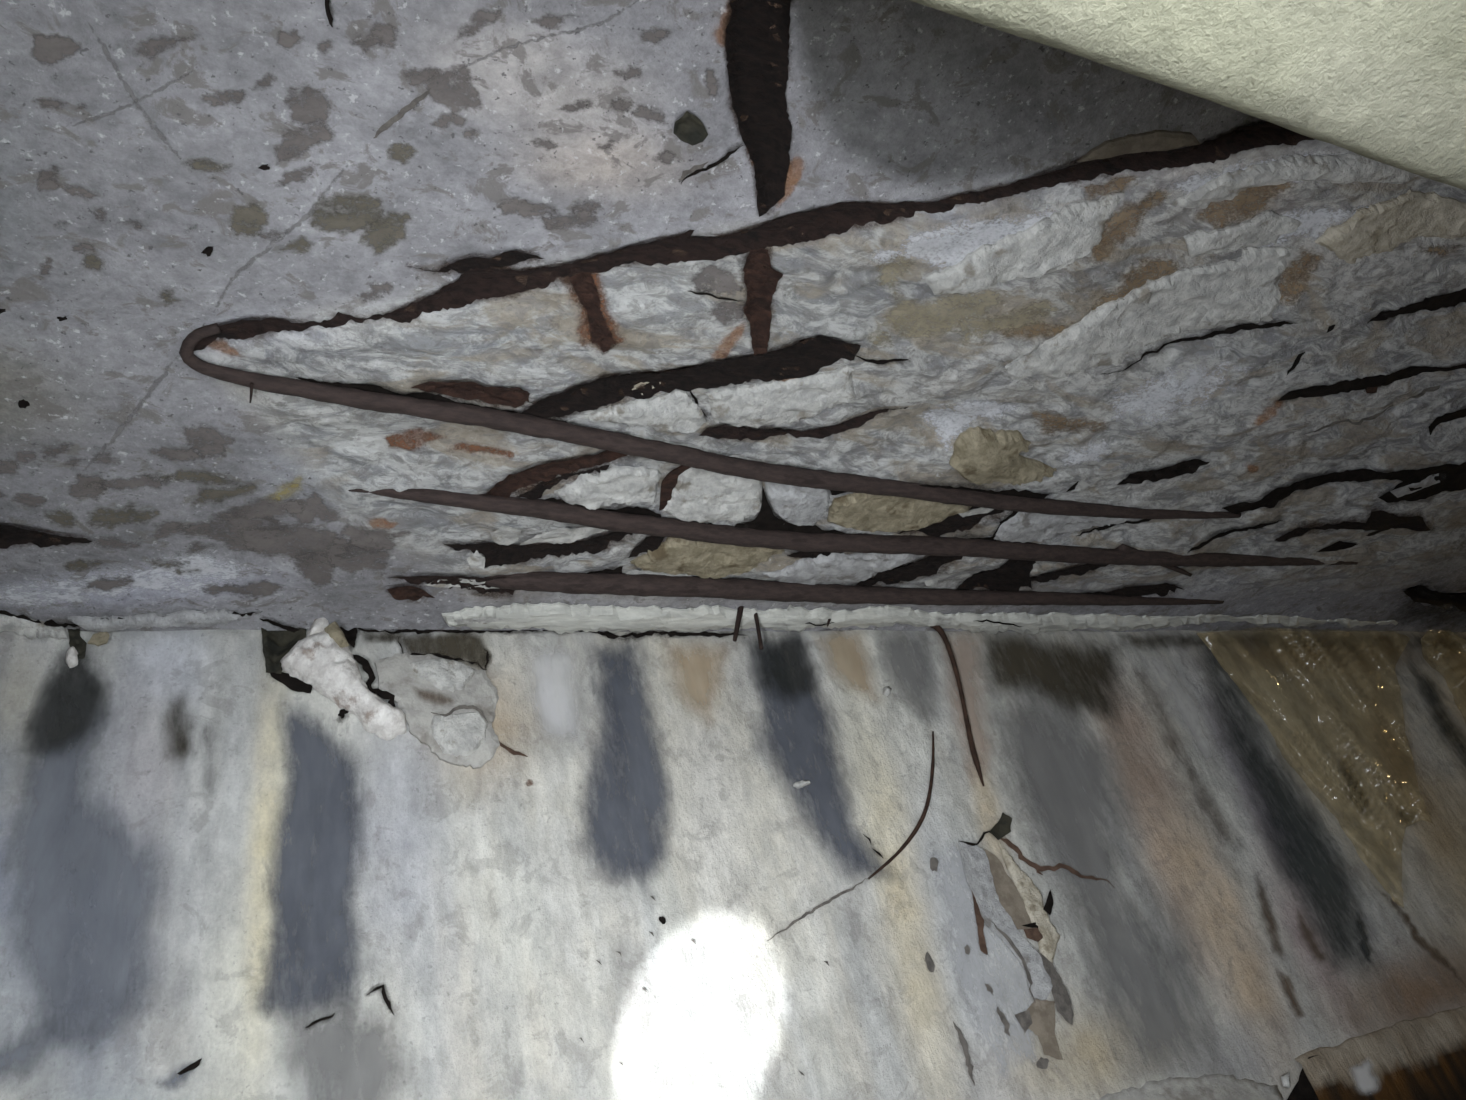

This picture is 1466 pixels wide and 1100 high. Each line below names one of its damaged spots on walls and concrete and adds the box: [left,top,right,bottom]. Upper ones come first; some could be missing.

rust [389,251,623,354]
rust [513,326,854,419]
peeling [1005,210,1302,379]
rust [386,428,631,495]
spalling [179,323,1358,606]
leakage [280,617,407,741]
peeling [367,617,528,769]
leakage [587,646,666,877]
leakage [757,636,882,872]
leakage [262,713,393,1100]
crack [767,834,883,941]
crack [1001,838,1115,888]